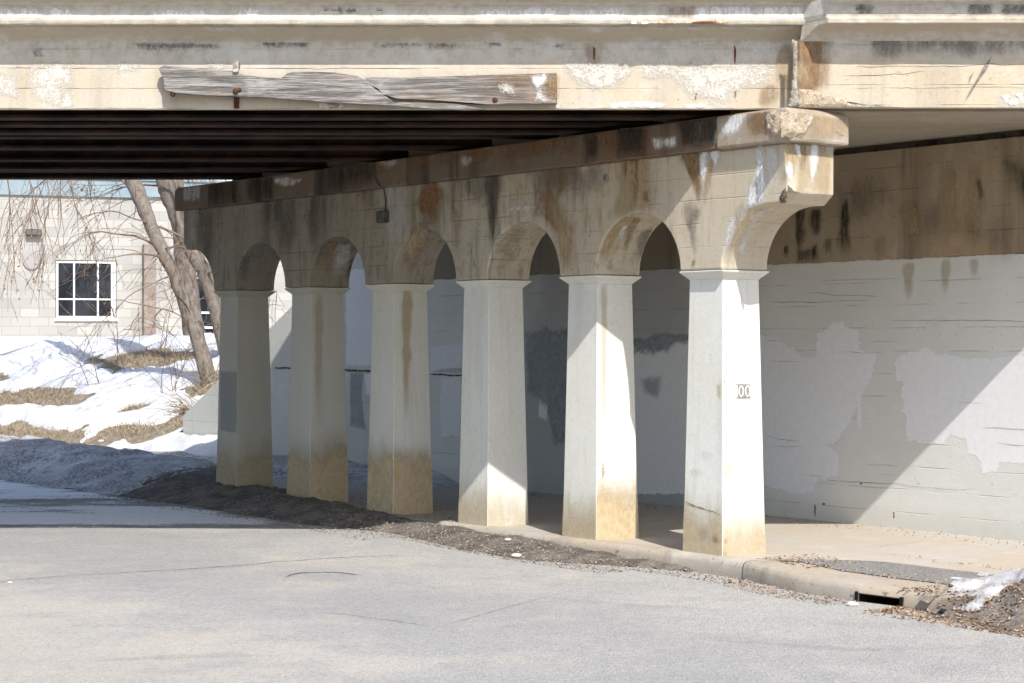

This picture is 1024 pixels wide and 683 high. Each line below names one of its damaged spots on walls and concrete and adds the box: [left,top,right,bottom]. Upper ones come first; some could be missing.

peeling [565,60,773,109]
spalling [766,40,887,139]
crack [852,60,1024,95]
leakage [619,111,766,194]
leakage [726,116,843,251]
leakage [784,210,820,259]
rust [403,292,411,387]